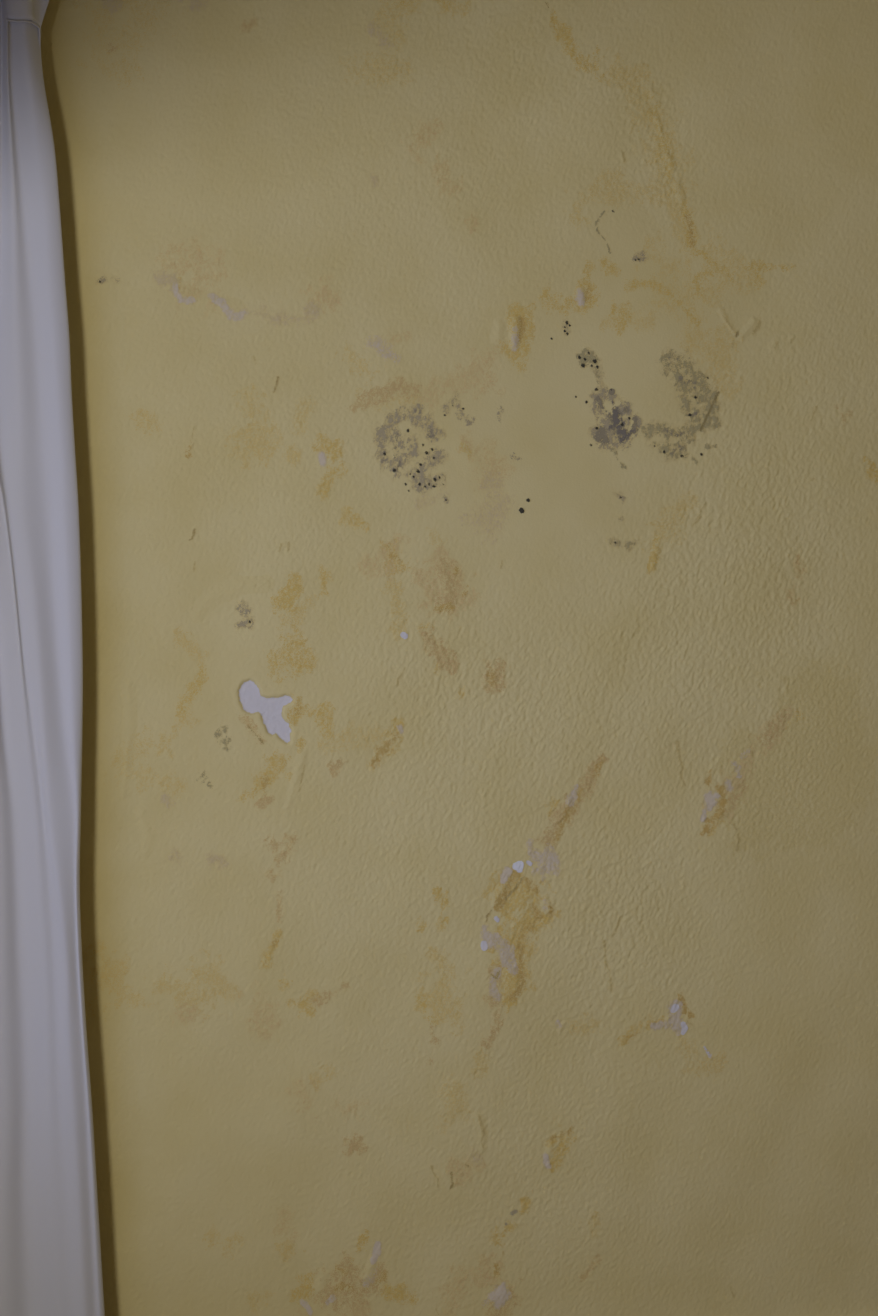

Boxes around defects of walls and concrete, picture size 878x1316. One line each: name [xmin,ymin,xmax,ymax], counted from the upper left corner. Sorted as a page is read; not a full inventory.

leakage [335,0,796,510]
leakage [224,384,480,700]
peeling [239,680,293,743]
peeling [500,860,532,884]